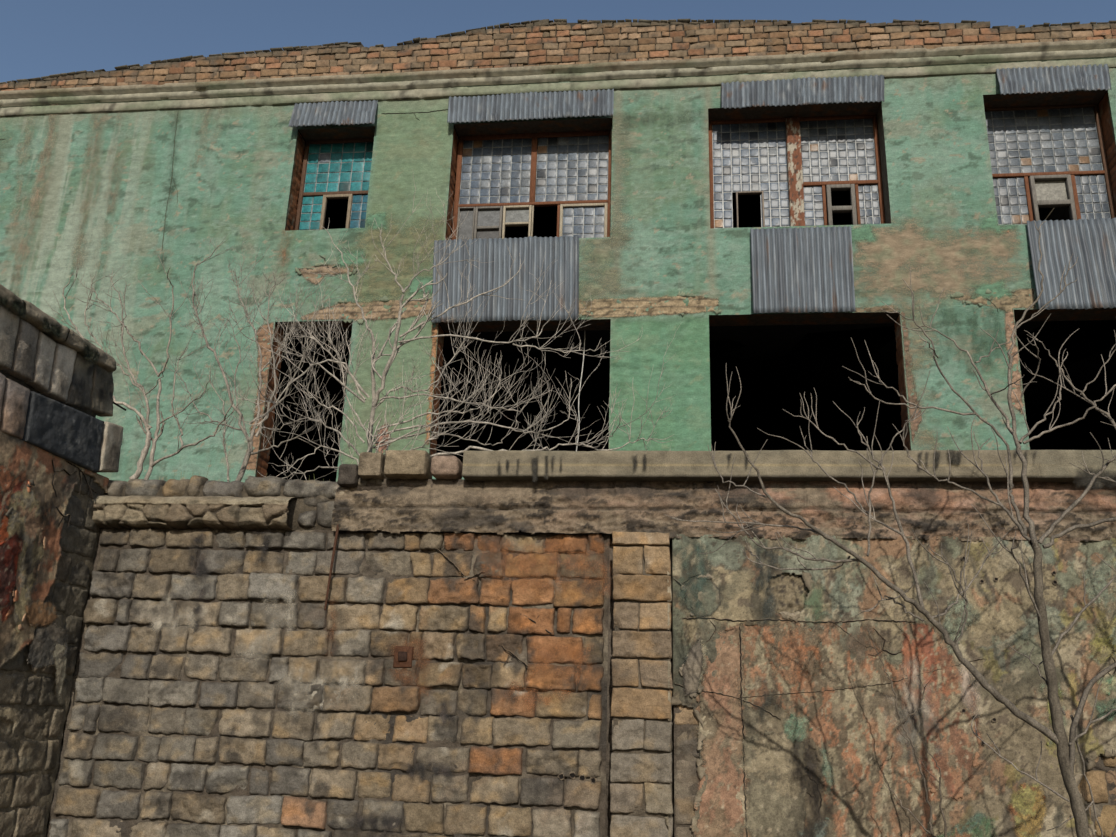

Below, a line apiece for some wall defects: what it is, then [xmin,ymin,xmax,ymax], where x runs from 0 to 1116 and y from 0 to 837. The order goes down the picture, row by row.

peeling [294,213,442,444]
peeling [851,217,1037,450]
peeling [0,464,57,633]
spalling [331,479,1116,543]
flaking render [0,708,21,722]
crack [673,574,984,837]
peeling [671,570,997,837]
peeling [1010,784,1046,837]
flaking render [1075,749,1116,837]
peeling [1079,562,1116,721]